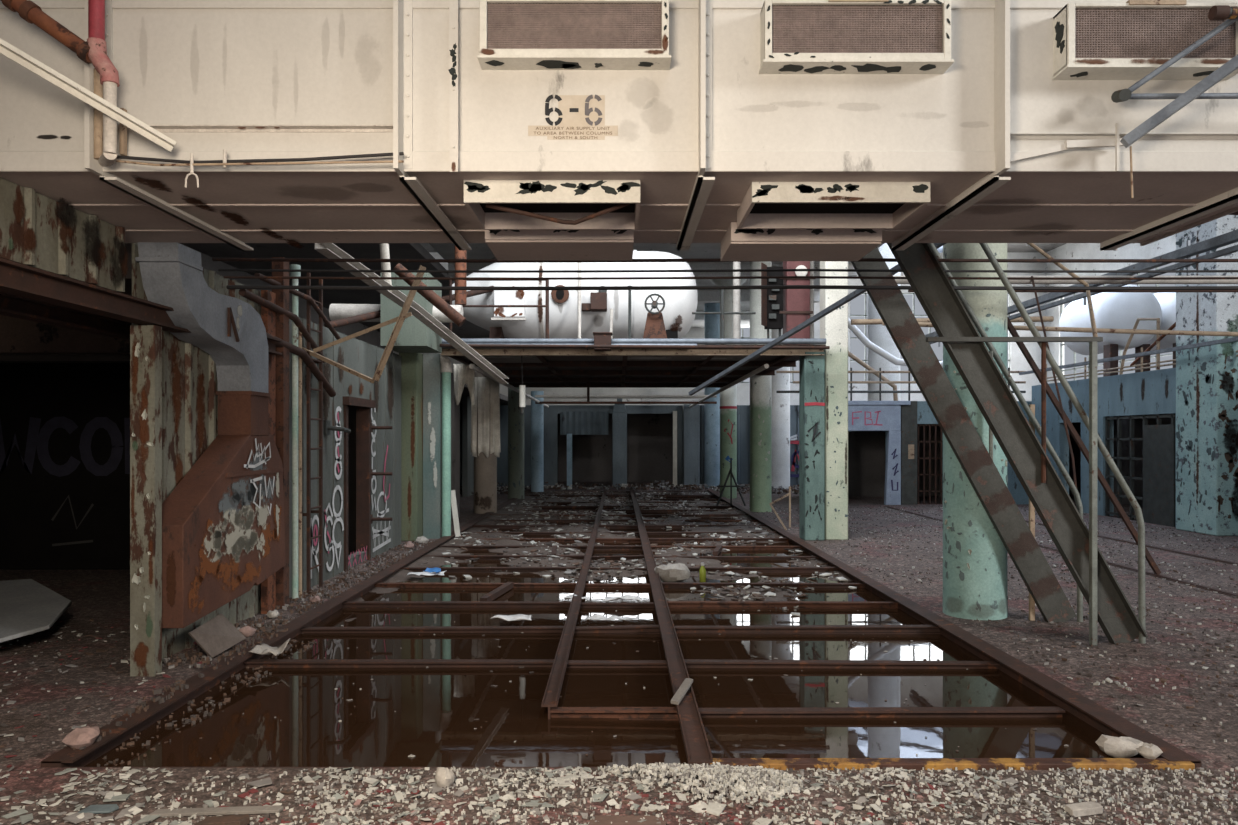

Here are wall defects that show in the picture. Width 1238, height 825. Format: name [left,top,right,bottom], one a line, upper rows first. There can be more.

peeling [767,5,901,73]
peeling [536,60,603,69]
peeling [464,182,490,193]
peeling [516,180,640,196]
peeling [752,185,778,198]
peeling [795,184,859,193]
peeling [912,184,929,193]
corrosion [13,192,37,250]
corrosion [131,341,149,533]
peeling [1176,351,1238,527]
corrosion [149,487,282,613]
corrosion [134,642,149,668]